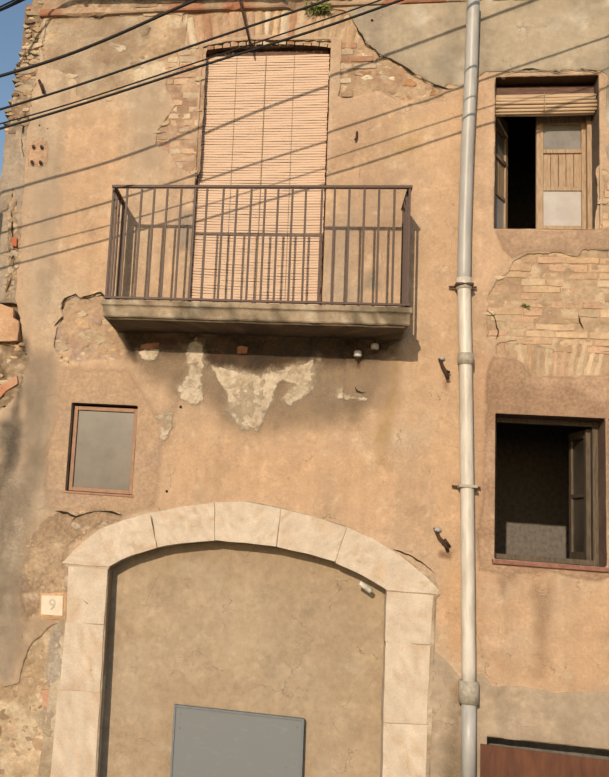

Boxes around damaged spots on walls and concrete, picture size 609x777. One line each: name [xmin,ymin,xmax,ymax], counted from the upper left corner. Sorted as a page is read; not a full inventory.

spalling [4,0,442,179]
spalling [2,190,23,300]
spalling [595,165,609,229]
spalling [483,249,609,376]
spalling [0,342,29,410]
peeling [155,339,317,440]
crack [57,511,121,521]